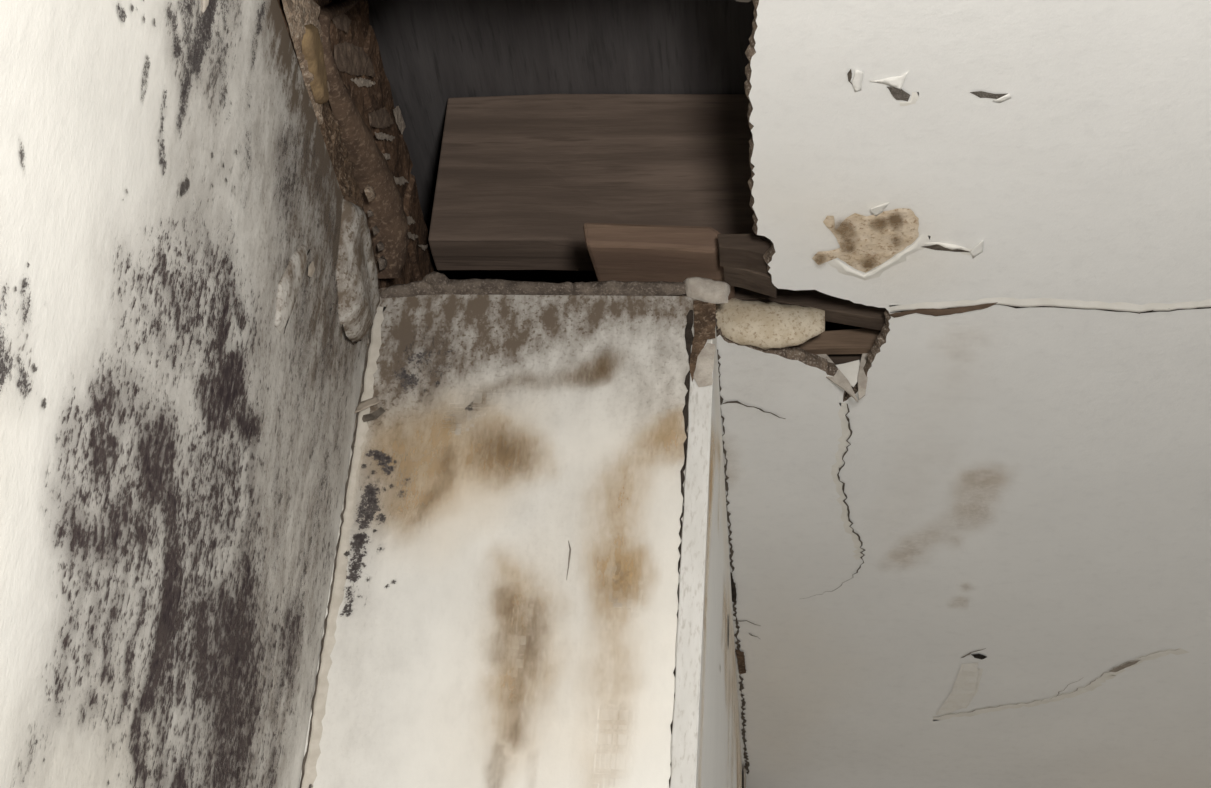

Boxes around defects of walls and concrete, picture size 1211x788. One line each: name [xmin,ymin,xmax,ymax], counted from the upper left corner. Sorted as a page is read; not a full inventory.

leakage [116,0,265,176]
flaking render [847,69,919,106]
flaking render [970,91,1011,103]
leakage [0,262,38,398]
flaking render [277,0,716,387]
peeling [812,202,984,280]
crack [887,297,1211,318]
leakage [45,128,452,788]
leakage [466,436,520,470]
crack [677,310,785,774]
crack [802,403,865,599]
crack [933,648,1189,721]